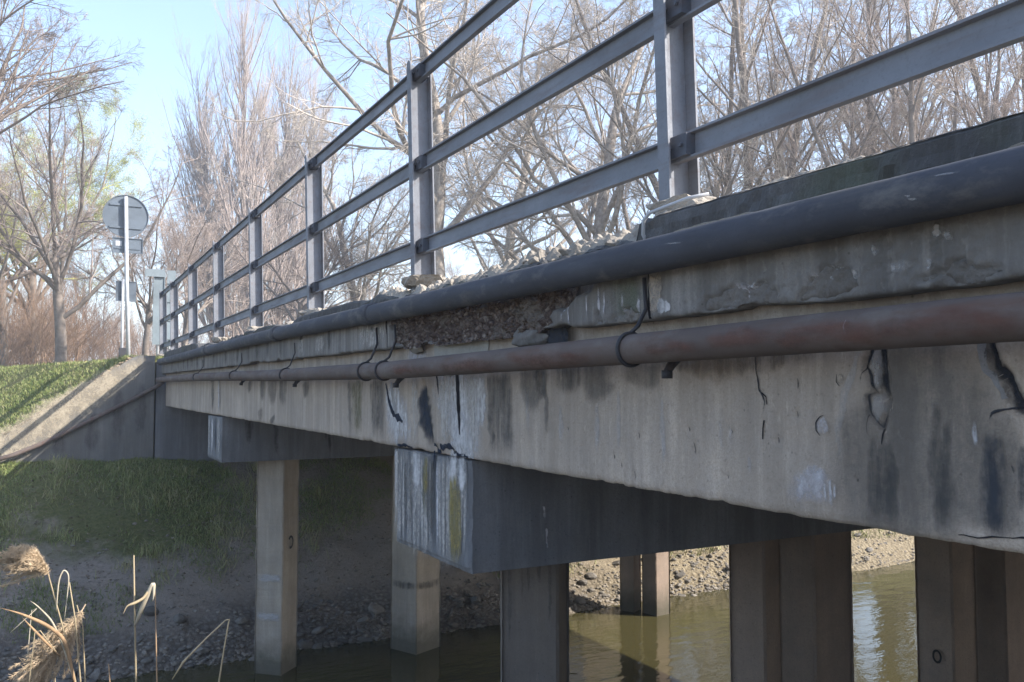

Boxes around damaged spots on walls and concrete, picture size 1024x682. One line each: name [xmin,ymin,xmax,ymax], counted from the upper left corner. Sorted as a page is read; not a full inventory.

spalling [391,287,579,354]
crack [385,375,468,470]
leakage [352,375,510,553]
crack [755,357,767,439]
crack [860,349,893,444]
leakage [973,431,1024,524]
crack [977,343,1024,417]